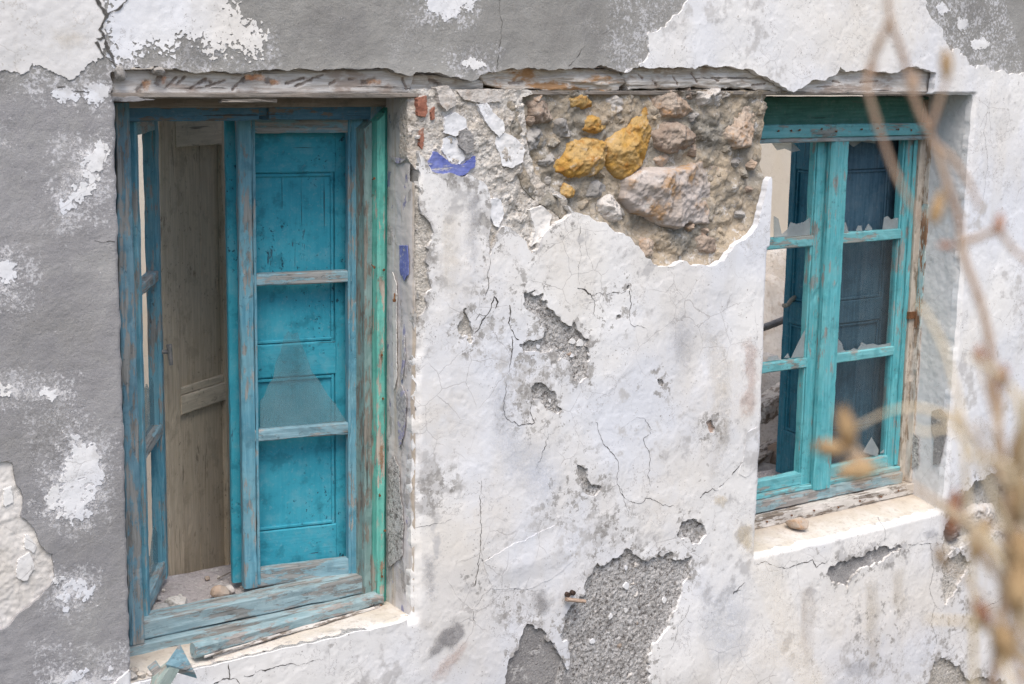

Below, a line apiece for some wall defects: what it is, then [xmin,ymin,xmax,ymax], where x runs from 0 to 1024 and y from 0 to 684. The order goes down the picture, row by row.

crack [57,0,127,104]
peeling [0,0,272,108]
peeling [55,133,111,232]
flaking render [399,85,787,266]
crack [577,226,638,327]
crack [475,256,548,462]
flaking render [531,382,561,413]
flaking render [519,291,589,382]
crack [596,418,671,511]
flaking render [0,417,113,629]
flaking render [505,518,705,684]
flaking render [827,545,900,586]